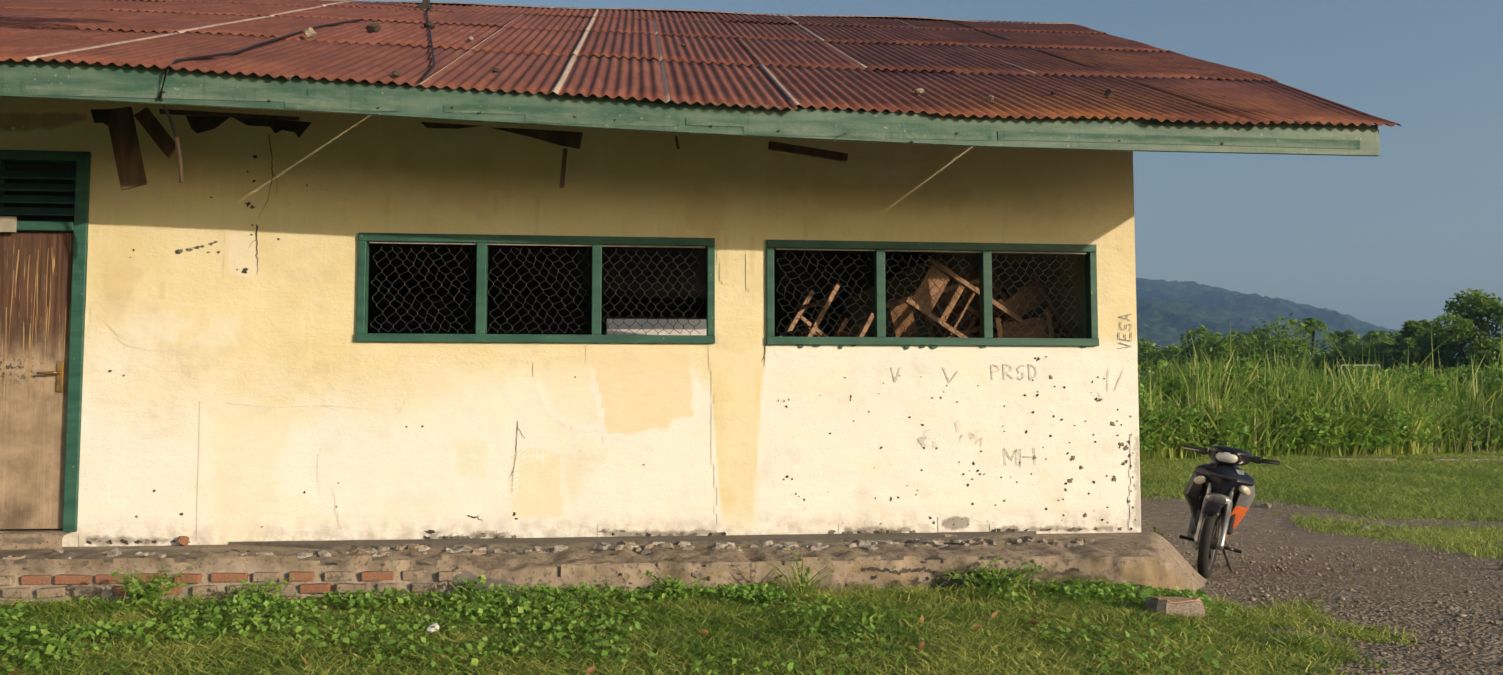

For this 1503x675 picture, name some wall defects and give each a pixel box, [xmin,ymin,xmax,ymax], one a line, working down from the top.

peeling [0,335,1141,604]